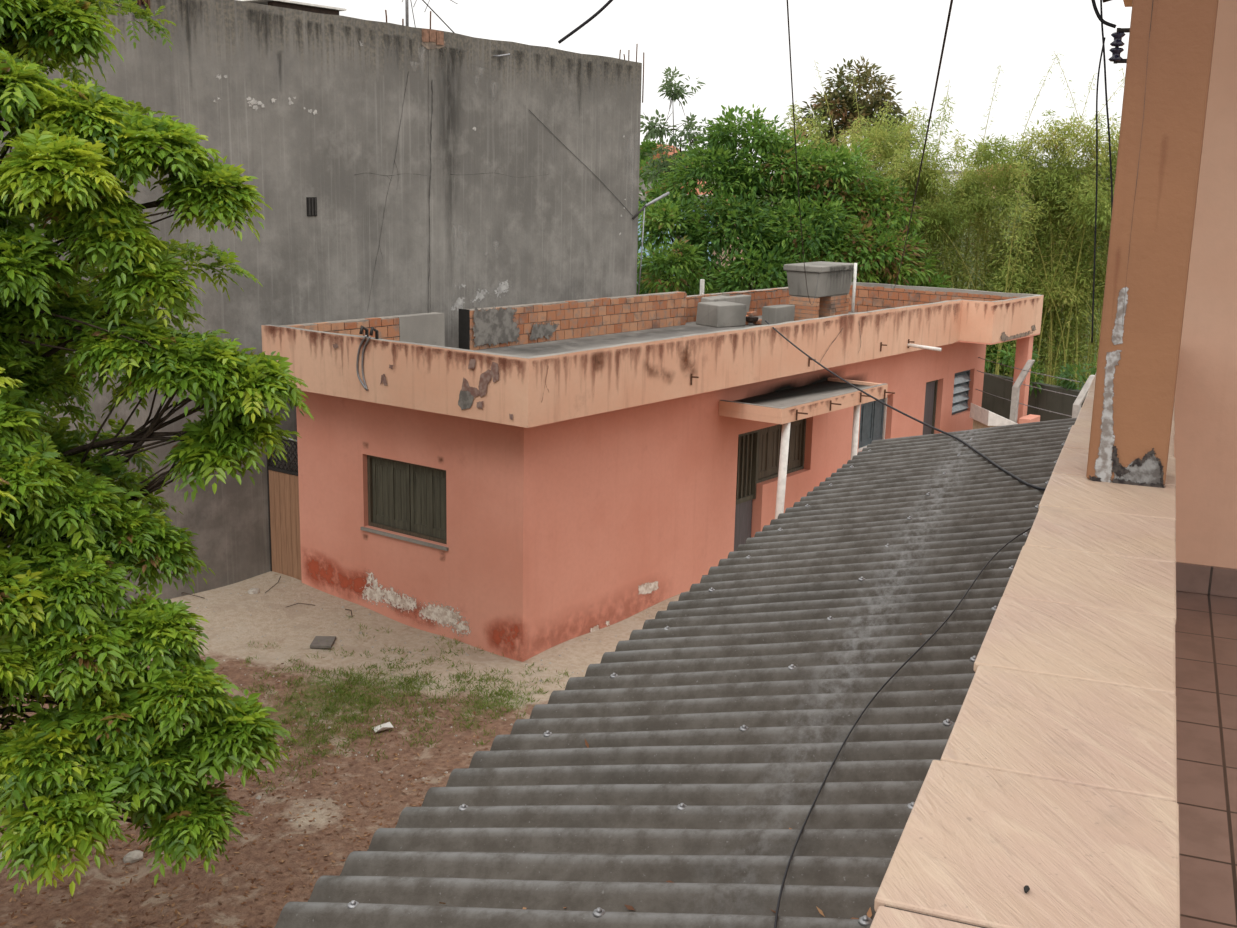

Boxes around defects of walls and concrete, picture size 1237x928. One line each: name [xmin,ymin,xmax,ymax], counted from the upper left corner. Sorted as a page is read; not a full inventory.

damp [359,338,527,368]
peeling [451,279,560,410]
damp [734,374,881,411]
peeling [1089,287,1166,488]
damp [306,558,471,636]
damp [490,624,520,652]